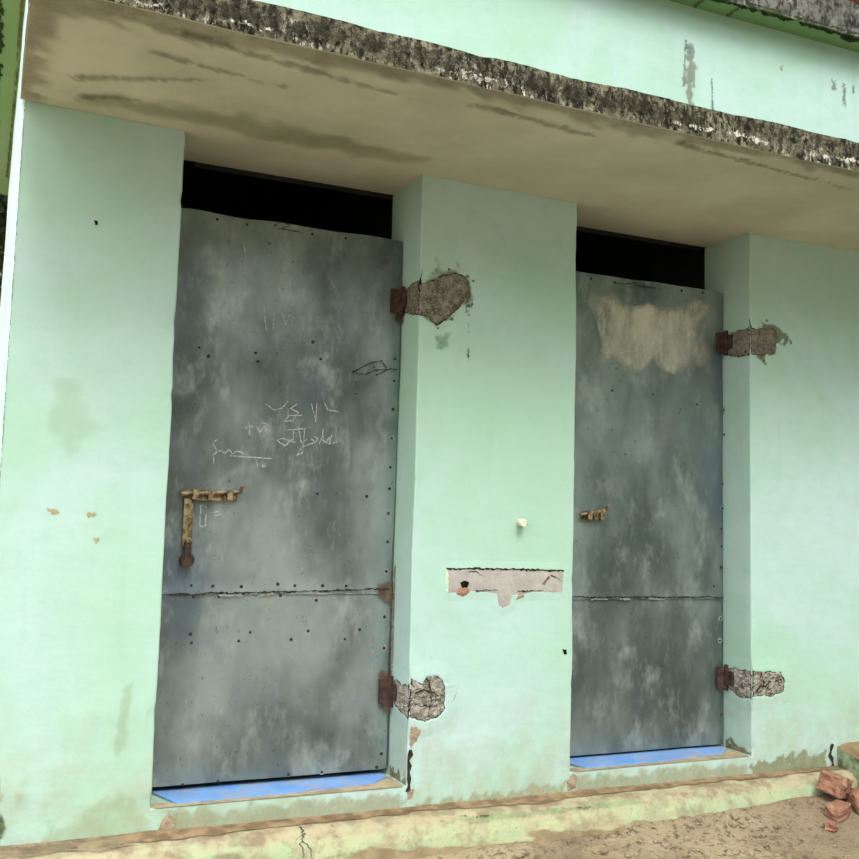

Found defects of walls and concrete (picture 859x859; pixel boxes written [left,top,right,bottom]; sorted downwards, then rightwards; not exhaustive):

spalling [405,268,475,329]
spalling [728,319,792,365]
peeling [439,560,570,616]
spalling [723,655,794,710]
spalling [390,660,459,800]
crack [297,826,313,859]